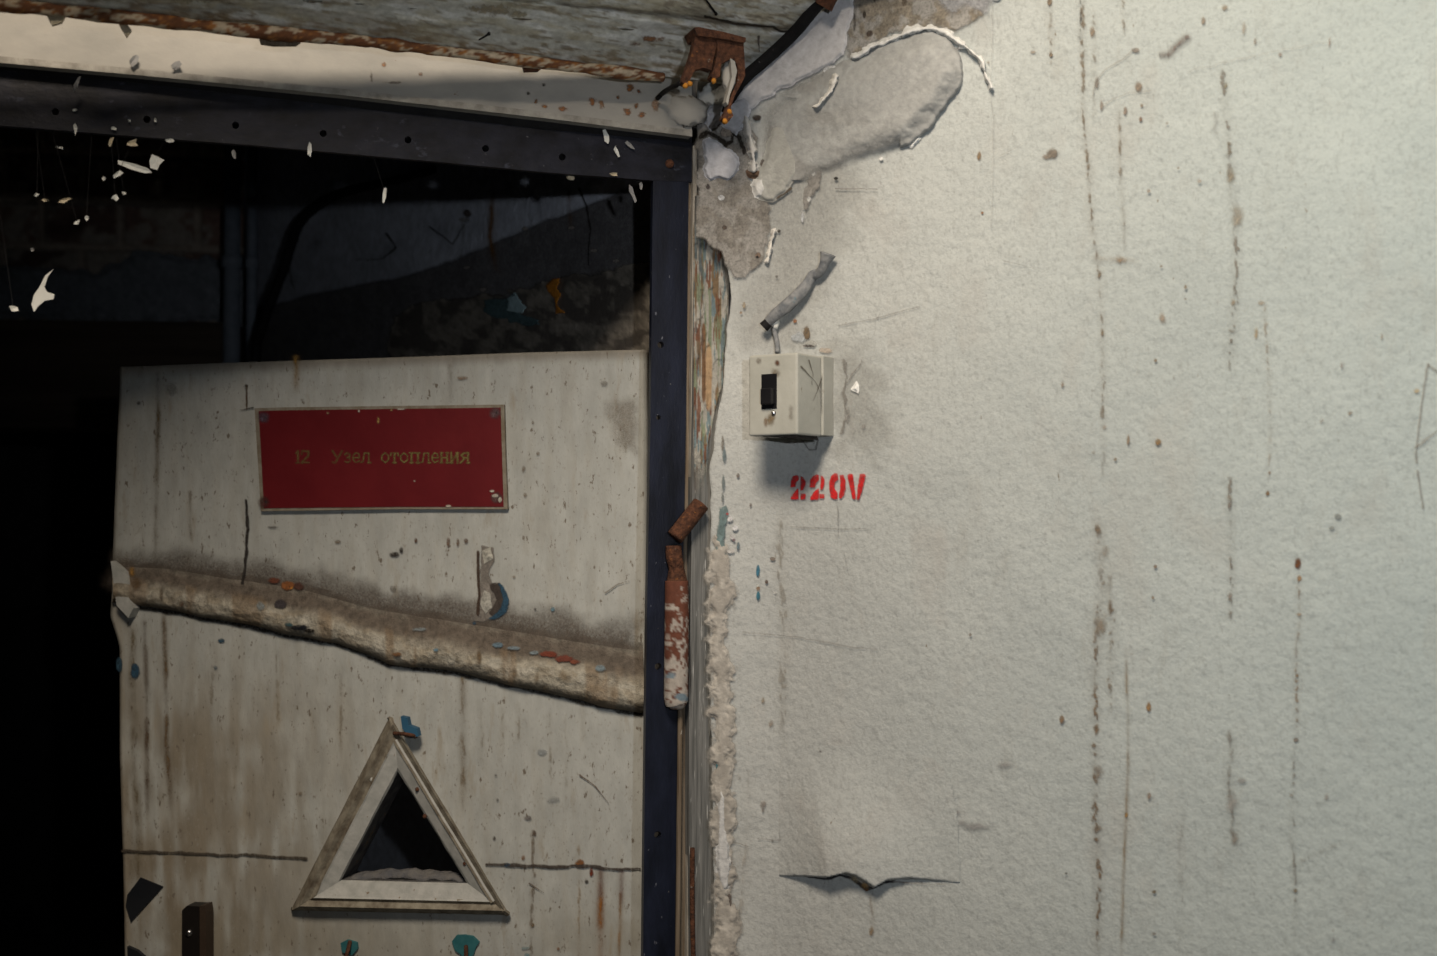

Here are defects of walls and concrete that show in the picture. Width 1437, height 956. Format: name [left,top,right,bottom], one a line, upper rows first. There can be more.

rust [0,0,665,117]
spalling [823,0,994,90]
flaking render [257,129,651,362]
spalling [693,98,867,956]